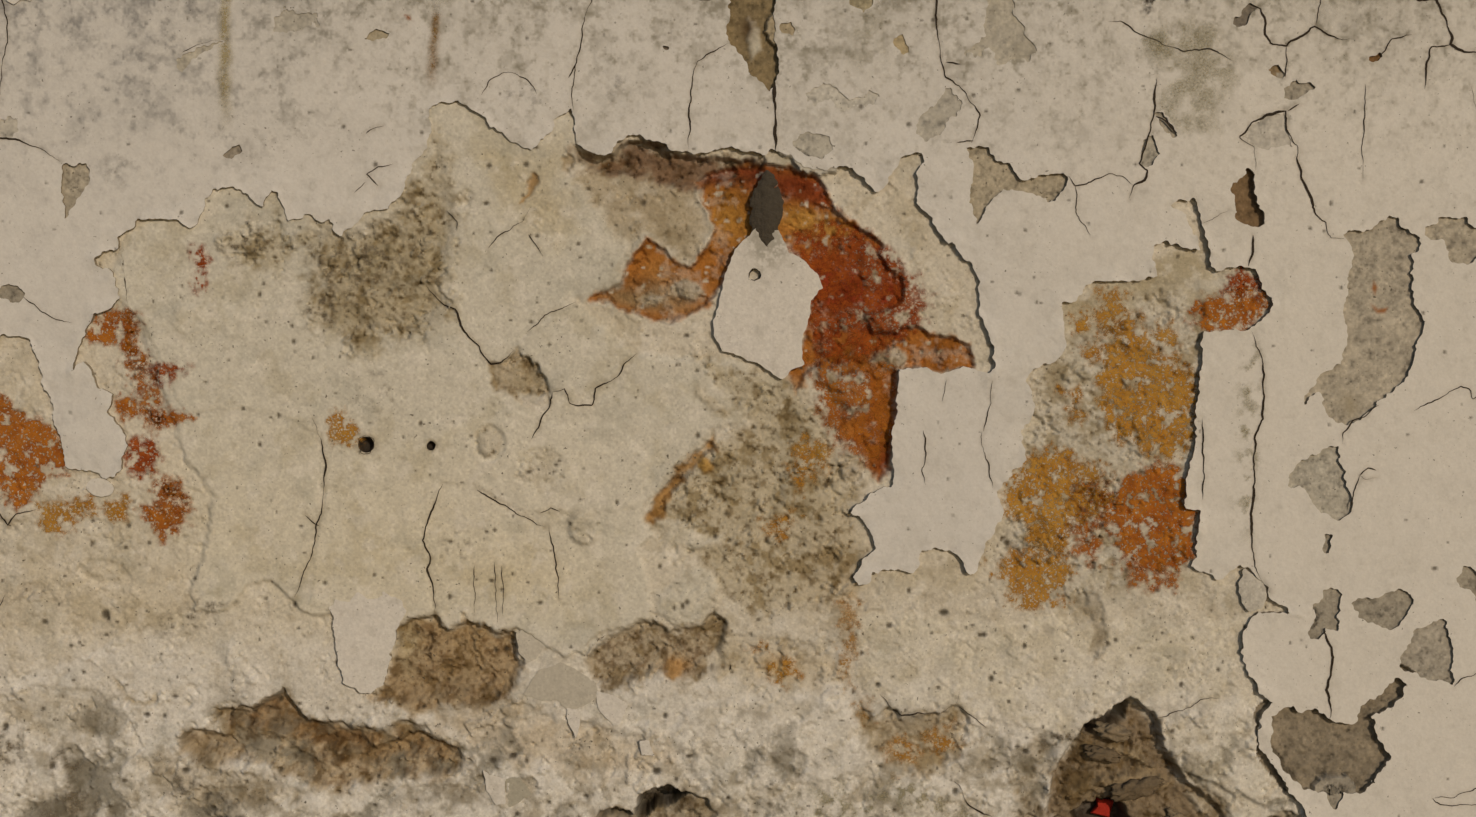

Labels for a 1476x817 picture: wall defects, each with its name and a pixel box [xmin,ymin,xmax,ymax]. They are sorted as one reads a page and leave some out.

crack [688,43,728,138]
spalling [726,0,795,91]
crack [771,83,779,152]
crack [935,0,981,143]
crack [1070,82,1177,236]
crack [1240,0,1347,239]
crack [1361,0,1476,162]
spalling [1304,216,1476,425]
spalling [0,88,1272,817]
spalling [1288,446,1353,553]
spalling [1456,566,1476,600]
spalling [1257,588,1454,809]